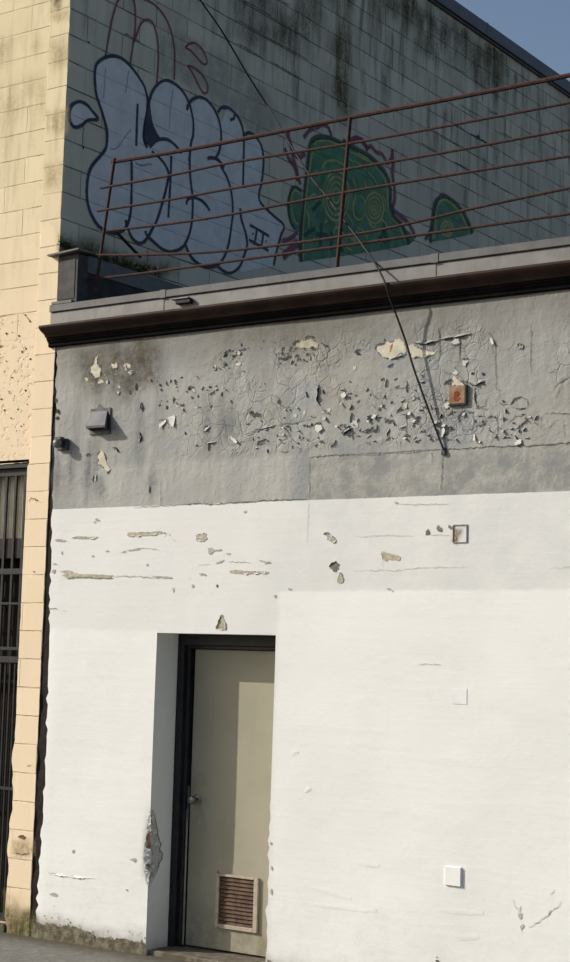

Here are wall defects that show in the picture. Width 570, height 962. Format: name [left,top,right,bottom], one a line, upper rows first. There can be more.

peeling [84,356,137,395]
peeling [213,335,328,372]
peeling [305,334,454,447]
peeling [443,358,485,386]
crack [142,328,570,533]
peeling [86,447,121,484]
spalling [51,531,271,592]
spalling [329,561,344,583]
spalling [381,551,400,561]
spalling [215,614,226,630]
spalling [130,810,163,886]